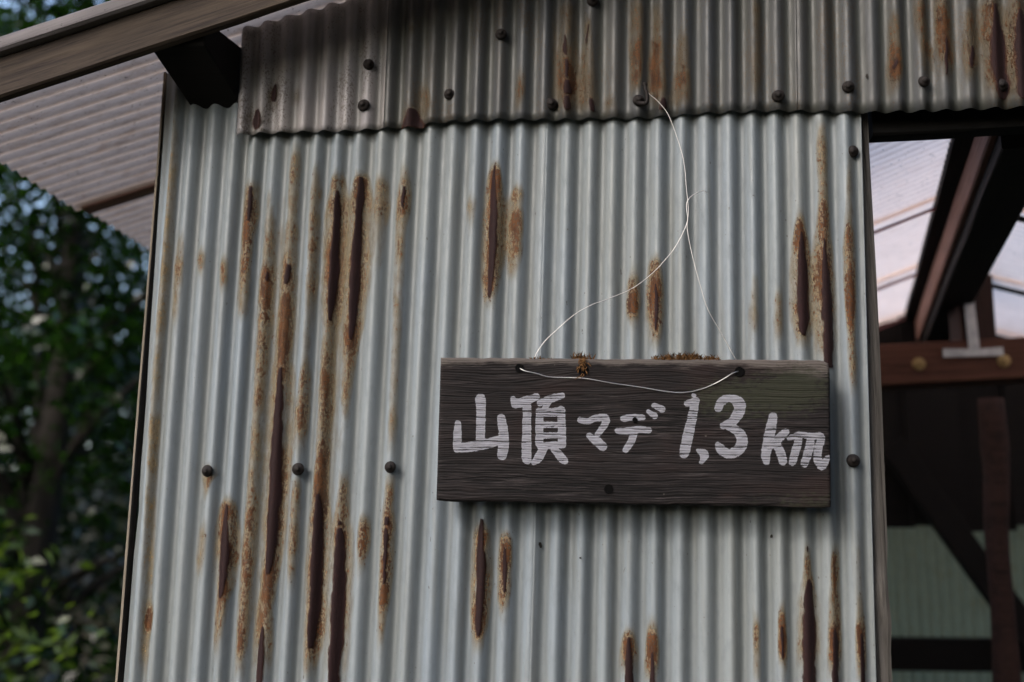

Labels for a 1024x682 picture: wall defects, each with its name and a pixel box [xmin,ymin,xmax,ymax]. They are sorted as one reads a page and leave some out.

corrosion [468,162,523,302]
corrosion [626,258,665,340]
corrosion [775,128,857,383]
corrosion [197,150,411,682]
corrosion [471,519,513,643]
corrosion [621,625,659,682]
corrosion [777,546,842,682]